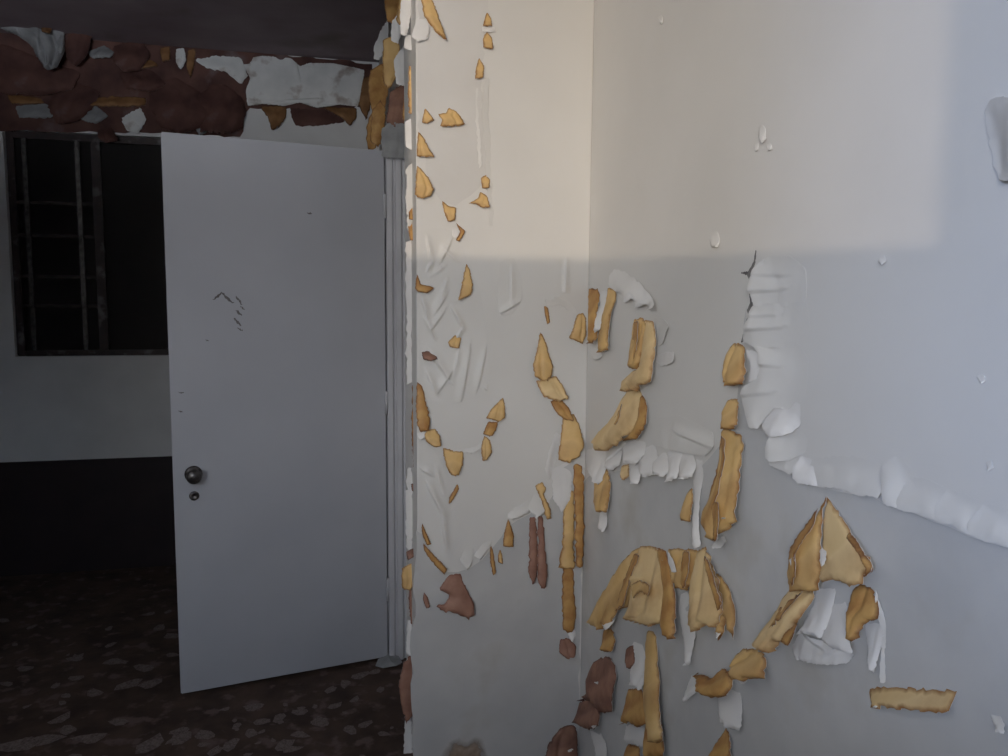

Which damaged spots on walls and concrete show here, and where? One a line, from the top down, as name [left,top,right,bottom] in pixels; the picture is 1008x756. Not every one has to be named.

peeling [0,0,505,504]
peeling [399,255,1008,756]
crack [741,250,757,343]